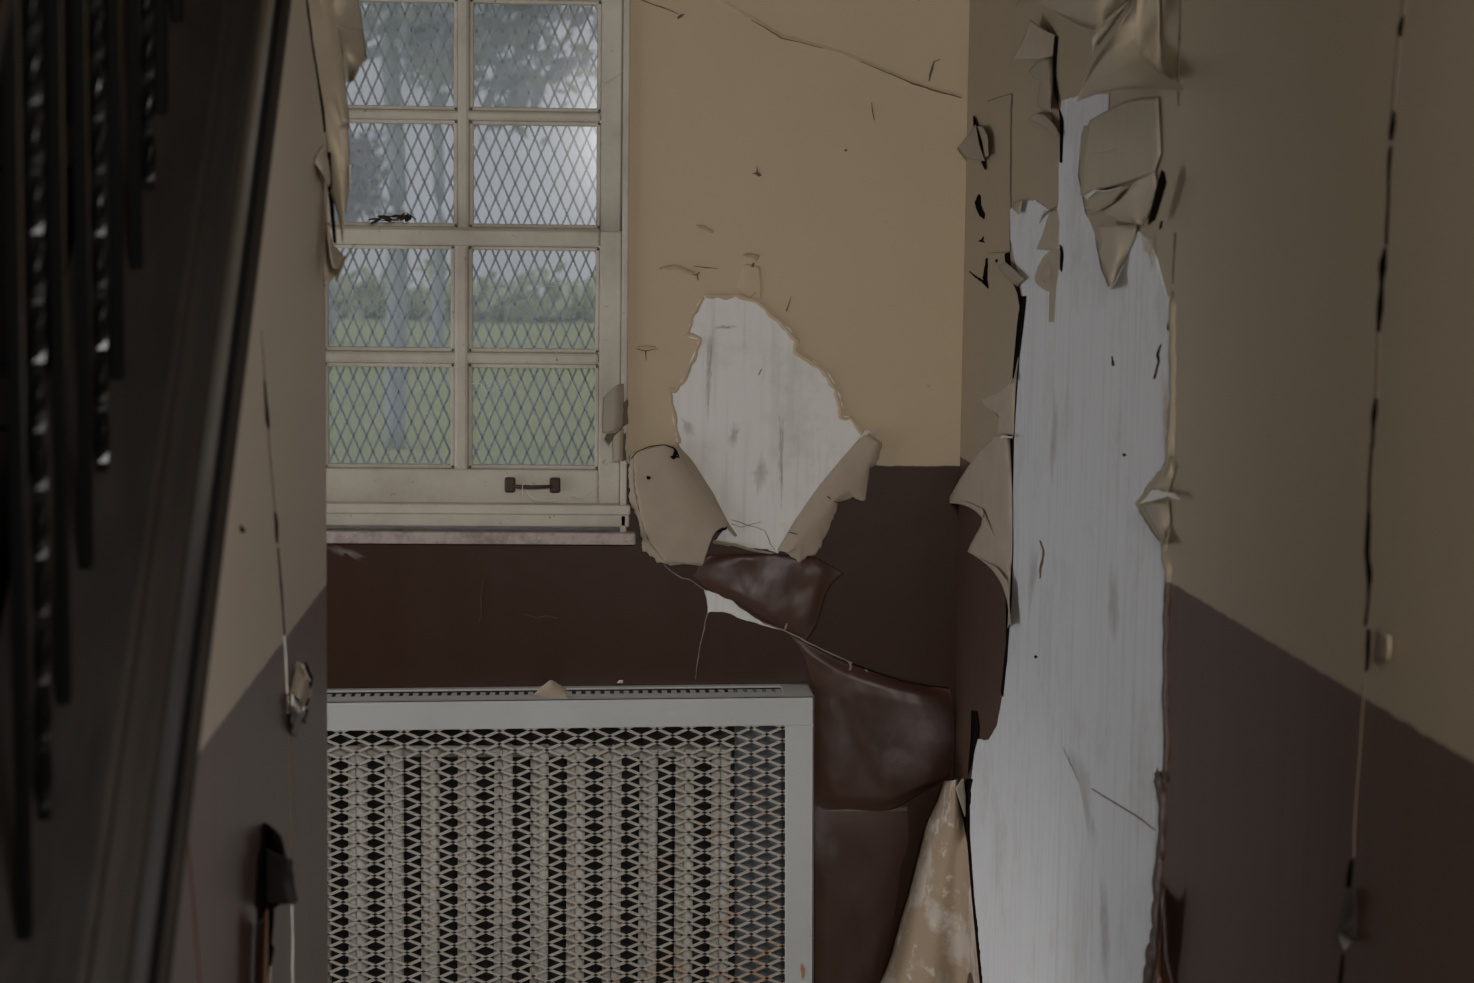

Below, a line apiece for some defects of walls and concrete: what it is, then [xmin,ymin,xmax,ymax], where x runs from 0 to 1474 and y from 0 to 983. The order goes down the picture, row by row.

peeling [306,0,368,287]
crack [642,0,1024,311]
crack [261,330,289,693]
peeling [603,294,882,566]
peeling [880,0,1188,983]
crack [1338,0,1405,983]
peeling [287,661,313,737]
crack [288,905,296,983]